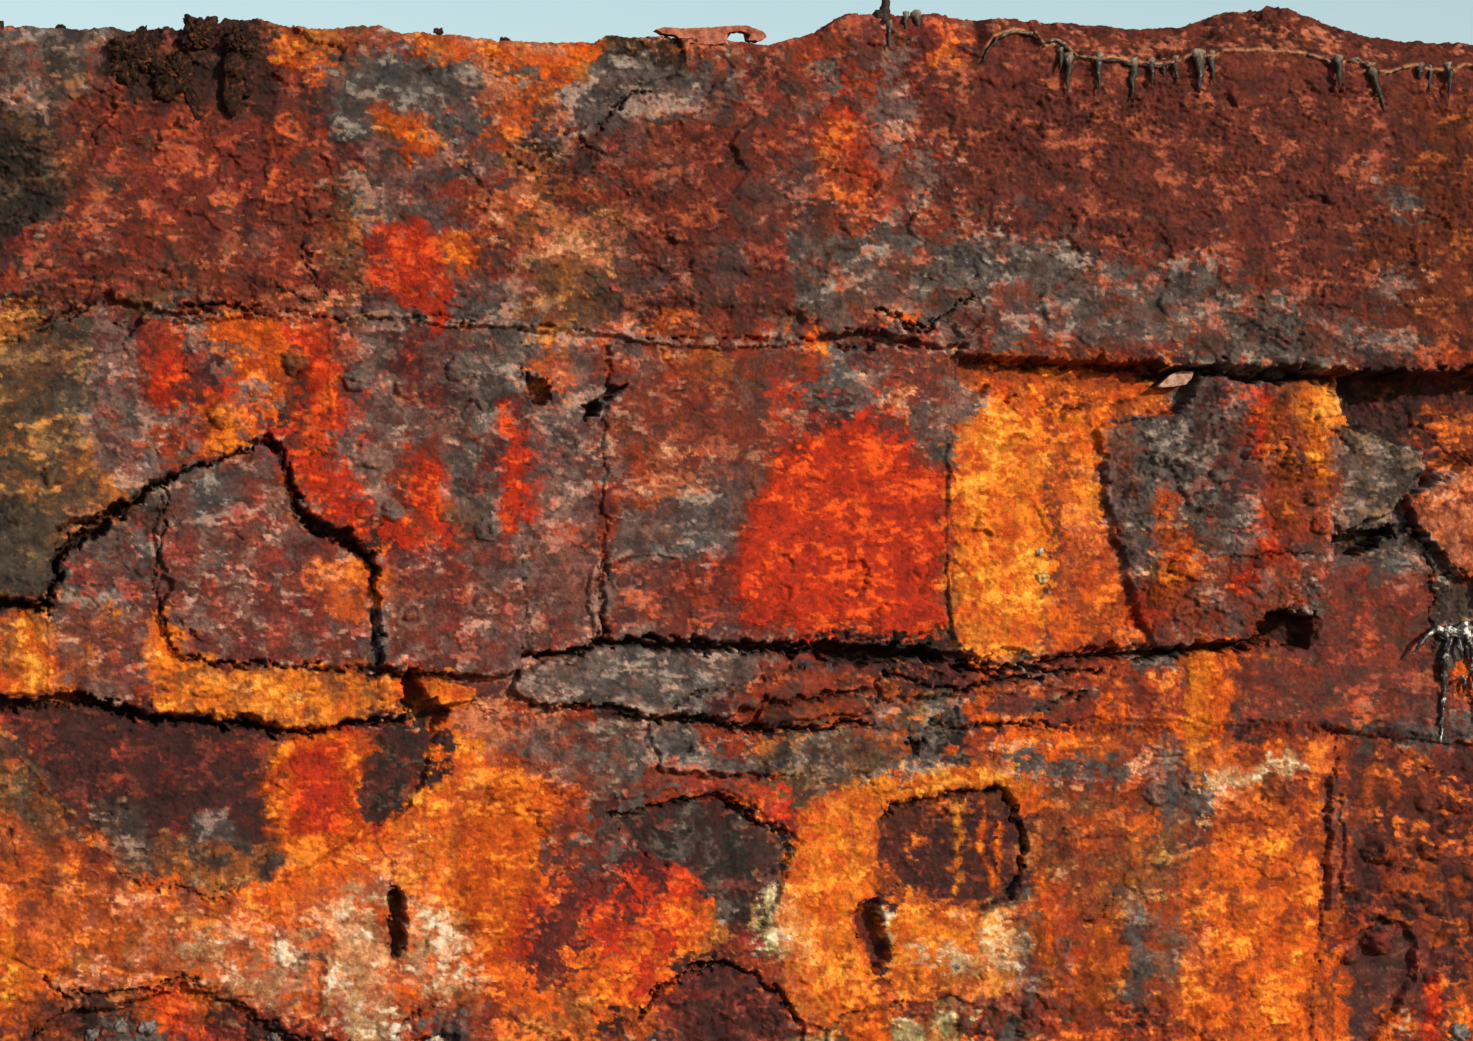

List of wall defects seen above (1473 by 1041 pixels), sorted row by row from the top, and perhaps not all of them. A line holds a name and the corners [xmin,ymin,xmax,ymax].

corrosion [363,217,480,307]
crack [0,433,466,744]
corrosion [260,725,377,862]
corrosion [211,311,441,543]
corrosion [452,756,550,964]
corrosion [728,419,947,632]
crack [518,558,1275,740]
corrosion [841,761,1031,892]
corrosion [1184,648,1230,785]
corrosion [1231,382,1333,594]
spalling [31,981,299,1041]
spalling [414,1029,463,1041]